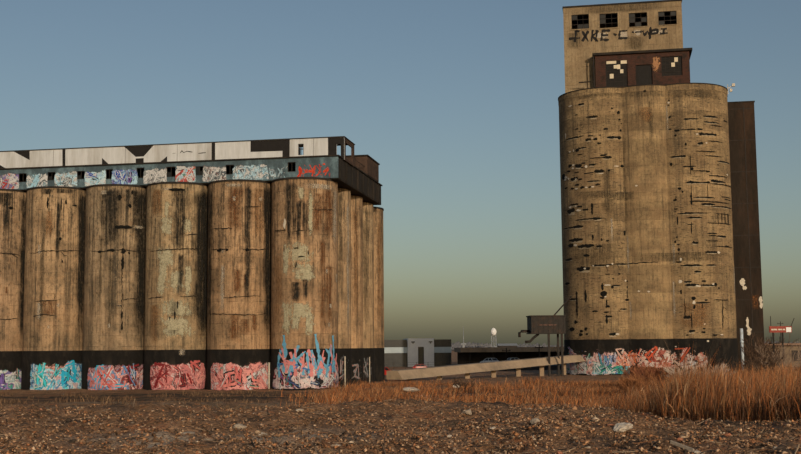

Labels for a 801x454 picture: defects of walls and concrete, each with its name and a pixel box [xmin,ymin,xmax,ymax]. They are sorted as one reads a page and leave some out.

damp [0,193,10,228]
damp [19,198,27,333]
damp [77,195,86,330]
peeling [161,202,172,235]
peeling [157,248,192,337]
damp [261,189,271,328]
peeling [282,302,316,335]
spalling [562,107,624,190]
spalling [668,115,732,254]
spalling [674,236,727,342]